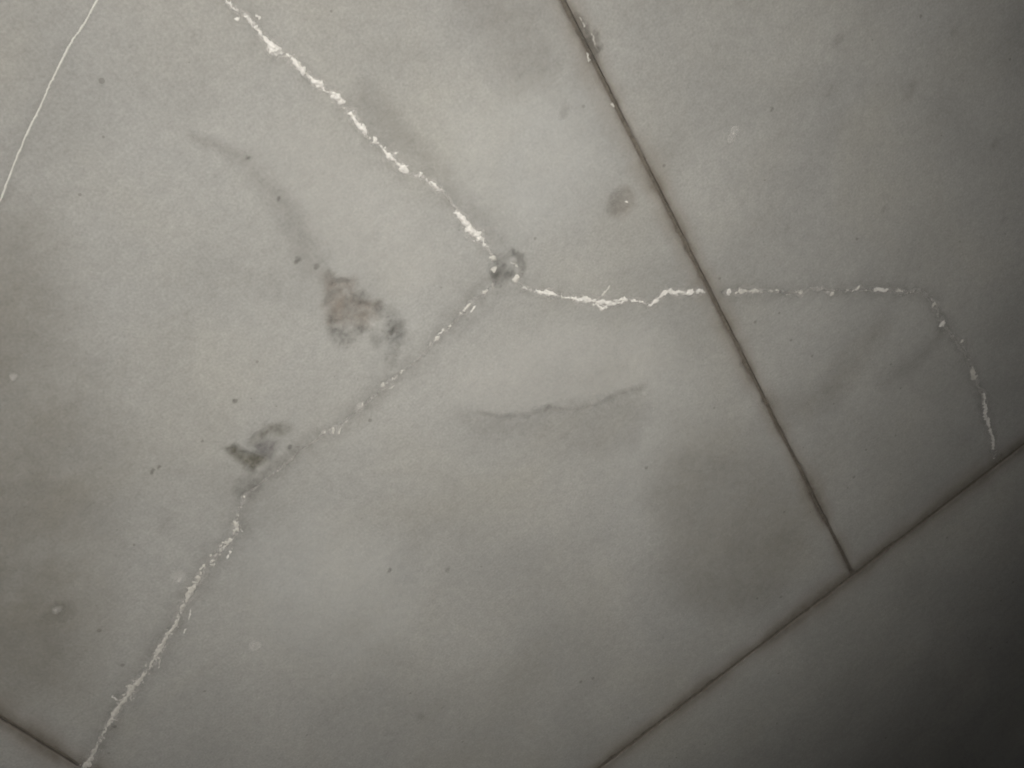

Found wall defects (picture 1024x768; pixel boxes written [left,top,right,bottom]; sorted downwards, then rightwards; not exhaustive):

crack [0,0,98,201]
crack [225,0,489,250]
crack [312,284,495,443]
crack [522,285,995,459]
crack [80,462,285,768]